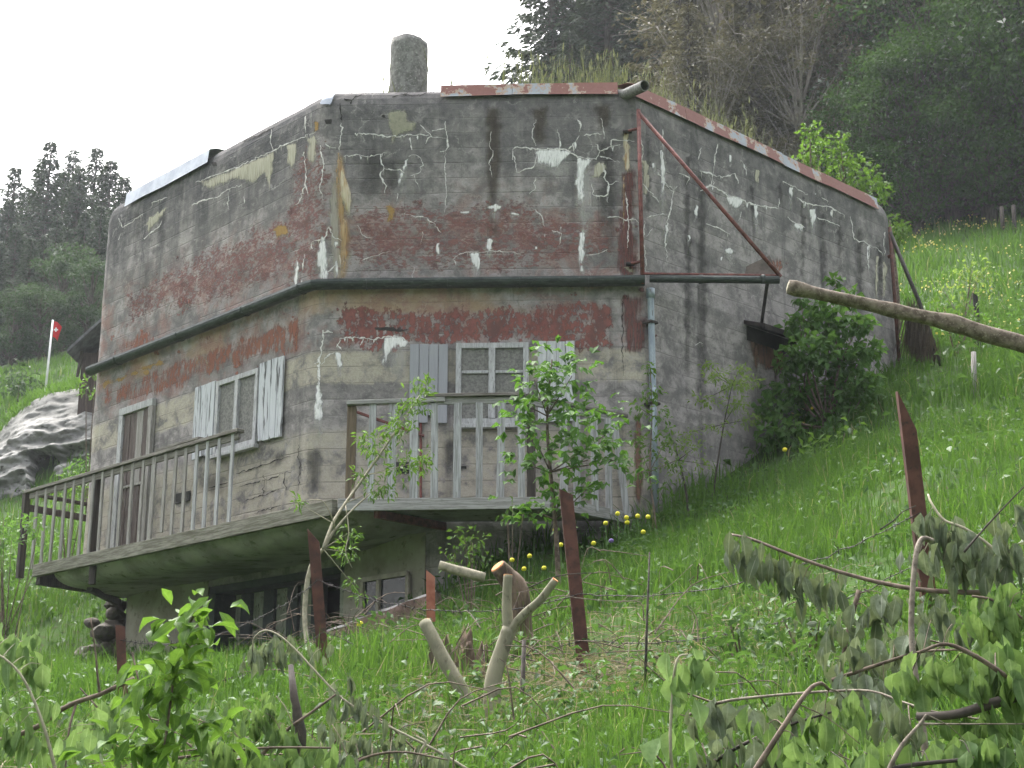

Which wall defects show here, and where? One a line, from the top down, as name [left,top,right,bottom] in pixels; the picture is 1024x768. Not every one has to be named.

crack [191,94,449,241]
crack [118,197,167,240]
corrosion [330,153,348,278]
crack [489,119,886,276]
damp [727,195,742,208]
crack [302,225,389,272]
peeling [102,141,657,405]
crack [453,250,524,265]
damp [685,180,705,313]
damp [860,248,887,296]
damp [383,337,408,362]
damp [314,385,323,421]